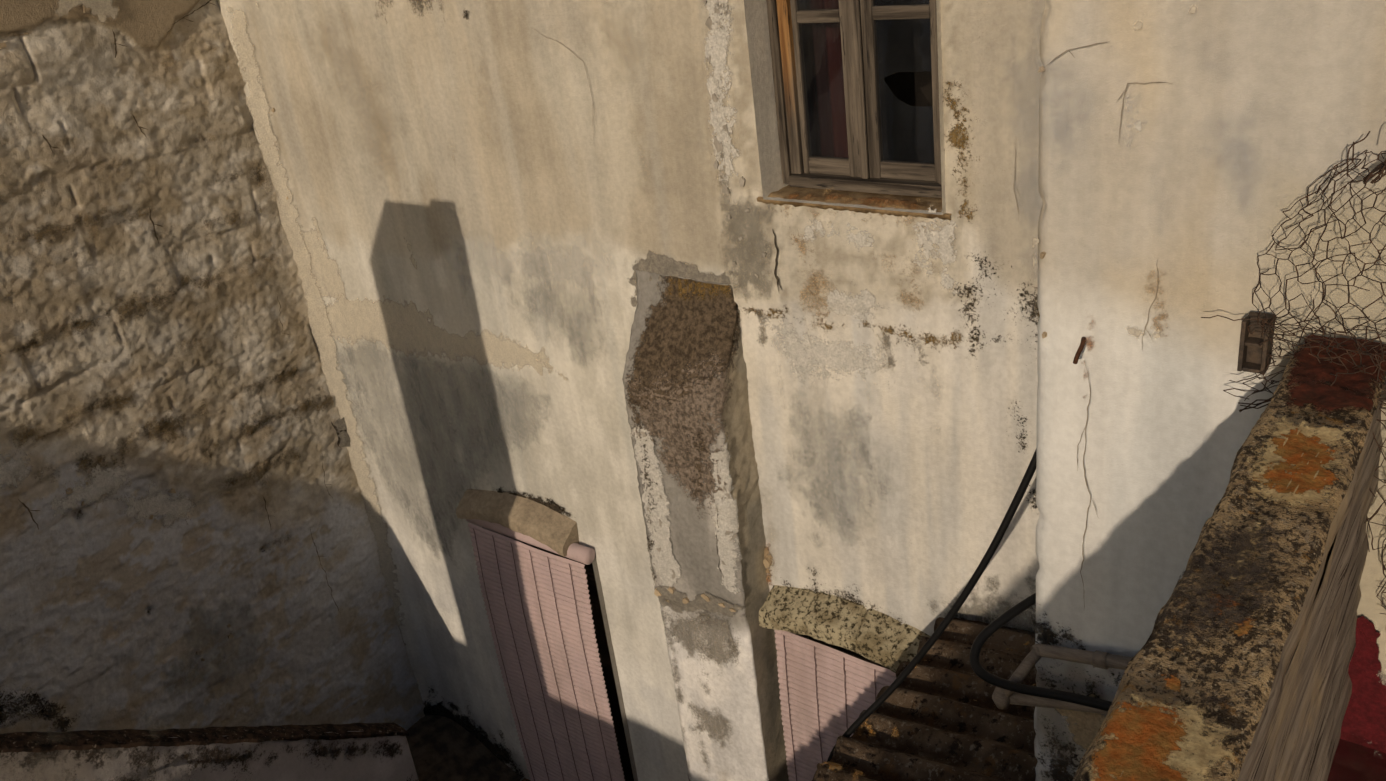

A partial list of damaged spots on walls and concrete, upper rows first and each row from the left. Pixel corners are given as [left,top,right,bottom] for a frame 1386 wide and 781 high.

peeling [56,0,118,22]
mould [944,82,977,220]
peeling [227,3,567,645]
mould [953,254,1012,357]
mould [1004,284,1040,342]
crack [1077,361,1098,607]
leakage [0,687,402,781]